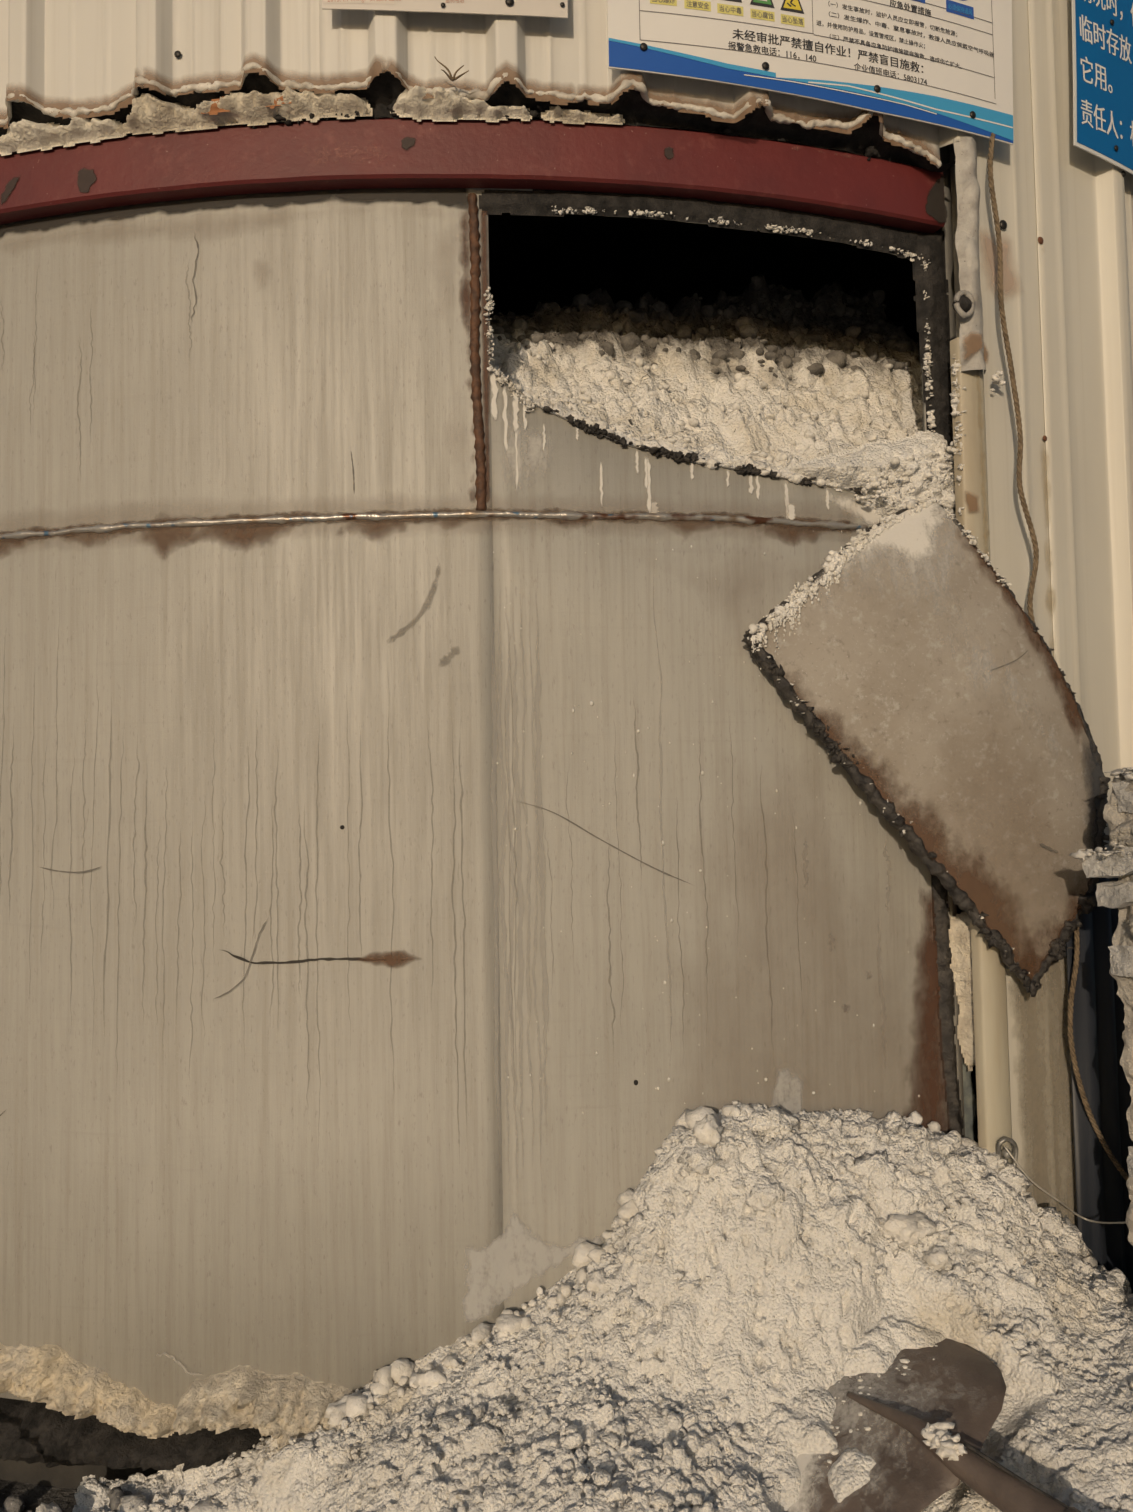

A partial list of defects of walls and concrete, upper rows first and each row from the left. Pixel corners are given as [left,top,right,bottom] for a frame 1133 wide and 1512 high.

peeling [217,97,412,129]
corrosion [461,214,471,329]
leakage [490,372,547,489]
leakage [635,450,658,513]
leakage [749,475,760,500]
leakage [146,524,286,552]
leakage [358,521,404,536]
crack [216,922,413,998]
corrosion [906,901,946,1133]